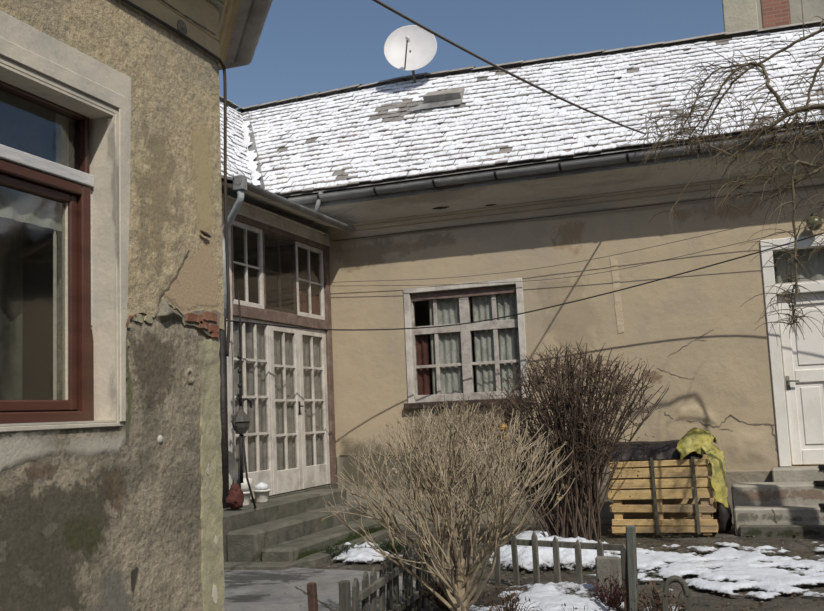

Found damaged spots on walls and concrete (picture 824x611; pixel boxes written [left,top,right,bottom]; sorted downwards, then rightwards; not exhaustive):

crack [158,248,190,305]
crack [658,329,714,379]
crack [665,413,779,455]
water stain [0,472,113,611]
water stain [98,567,139,611]